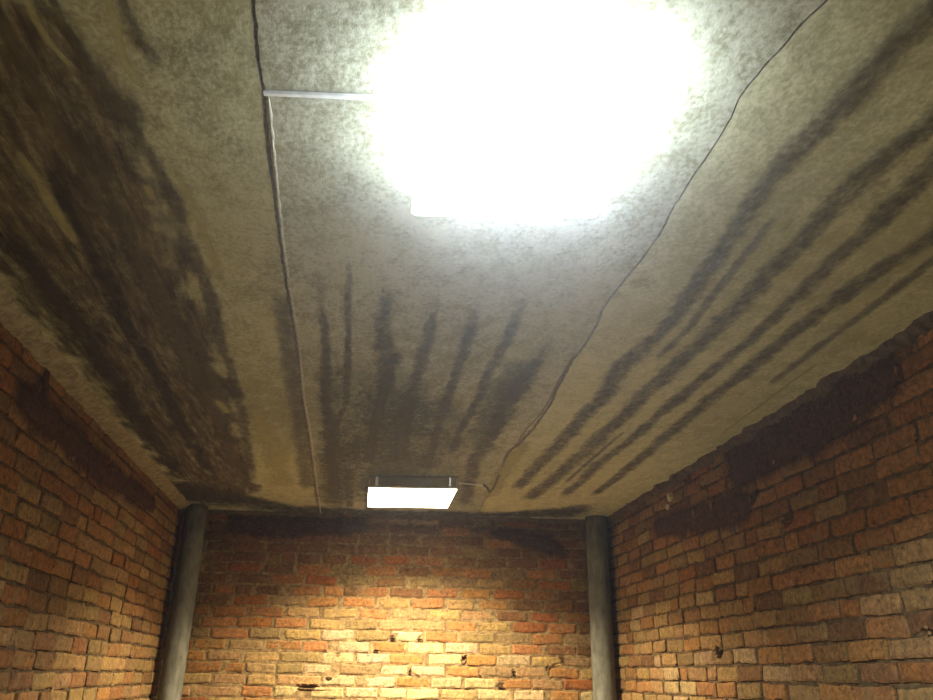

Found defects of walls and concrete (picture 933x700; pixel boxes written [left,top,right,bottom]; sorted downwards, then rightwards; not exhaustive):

crack [251,0,321,513]
damp [0,0,589,518]
crack [499,0,828,473]
damp [513,0,933,499]